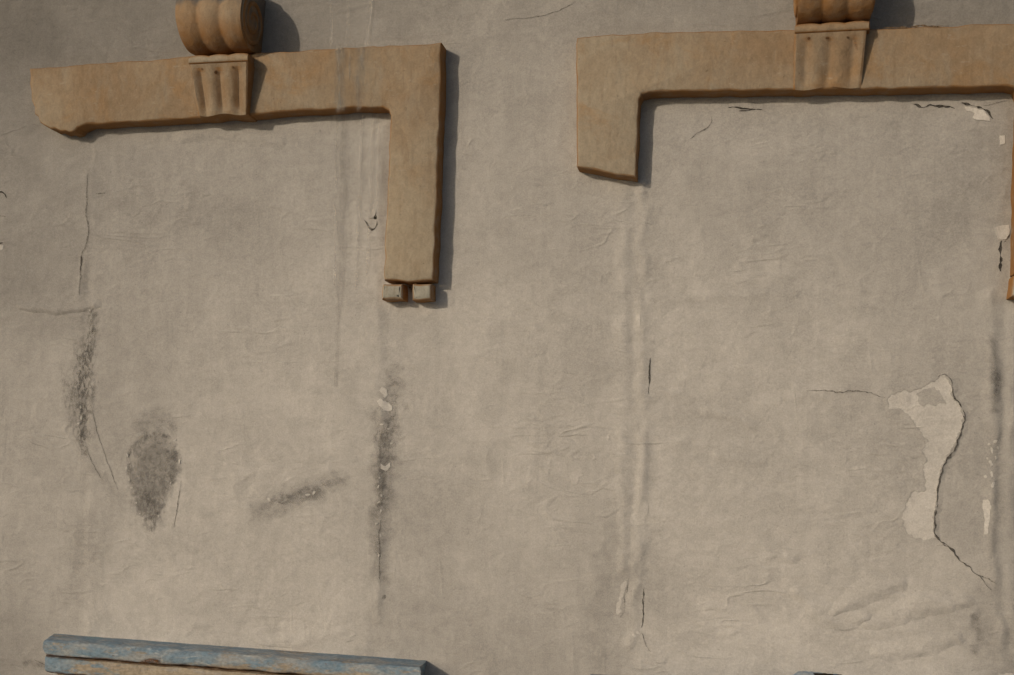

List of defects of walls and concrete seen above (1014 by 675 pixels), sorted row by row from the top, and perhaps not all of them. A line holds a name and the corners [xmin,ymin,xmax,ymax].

crack [914,101,1004,121]
crack [79,175,104,295]
crack [811,390,885,398]
water stain [125,434,181,525]
flaking render [882,371,970,545]
crack [934,375,997,588]